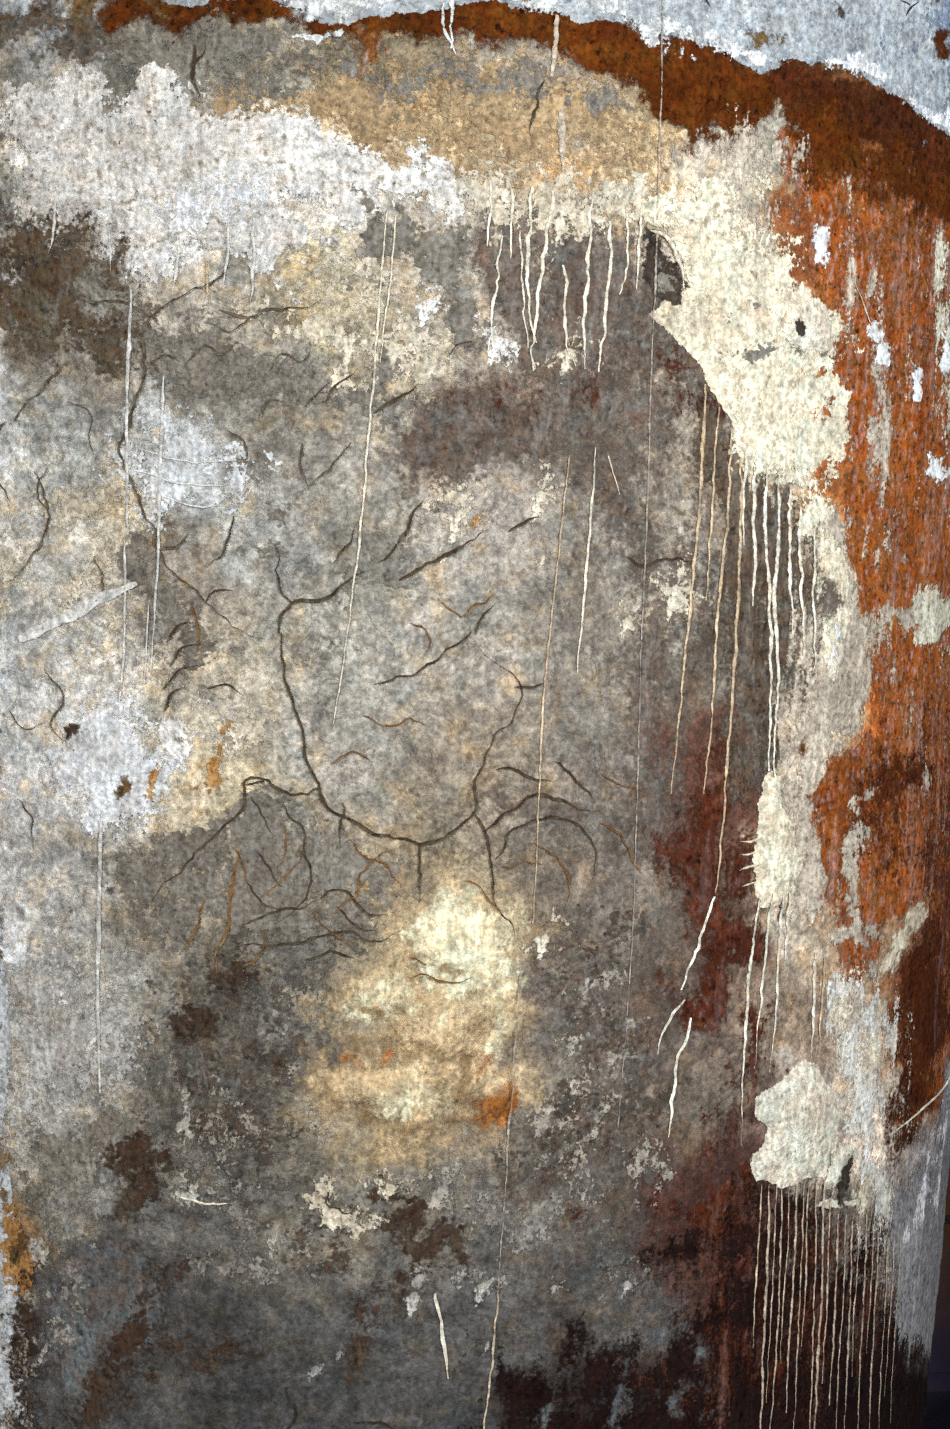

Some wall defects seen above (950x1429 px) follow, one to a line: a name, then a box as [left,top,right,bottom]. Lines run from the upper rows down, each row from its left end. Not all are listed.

rust [0,0,56,19]
rust [64,723,79,740]
water stain [0,936,375,1429]
crack [0,263,652,984]
water stain [0,0,826,893]
rust [67,0,950,1166]
water stain [402,893,928,1429]
rust [642,721,795,1294]